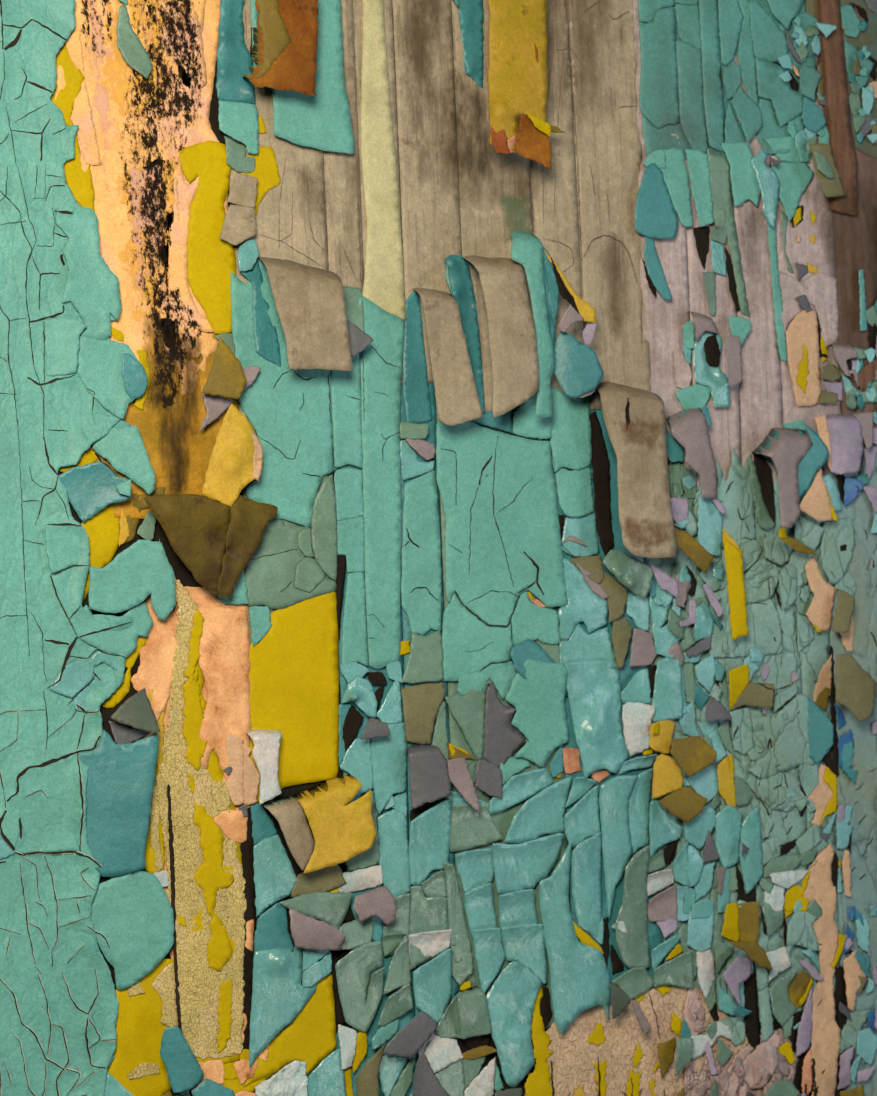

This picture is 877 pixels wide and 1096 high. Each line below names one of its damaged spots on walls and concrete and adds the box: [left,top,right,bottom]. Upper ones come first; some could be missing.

crack [0,0,131,1096]
leakage [80,0,112,63]
leakage [119,0,204,494]
peeling [0,0,396,1096]
crack [261,438,320,477]
crack [274,344,400,422]
crack [411,437,544,671]
peeling [454,0,565,169]
peeling [330,286,877,1096]
peeling [634,0,877,411]